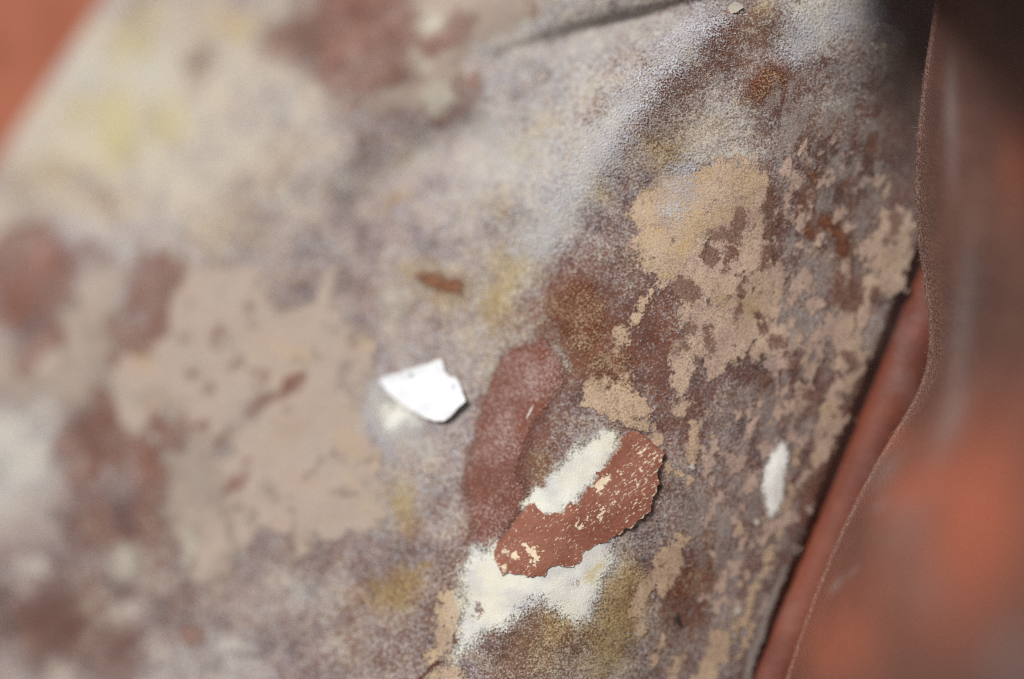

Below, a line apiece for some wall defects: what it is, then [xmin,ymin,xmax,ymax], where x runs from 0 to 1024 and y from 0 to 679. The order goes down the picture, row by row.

corrosion [739,58,797,108]
peeling [0,259,466,584]
peeling [417,130,917,679]